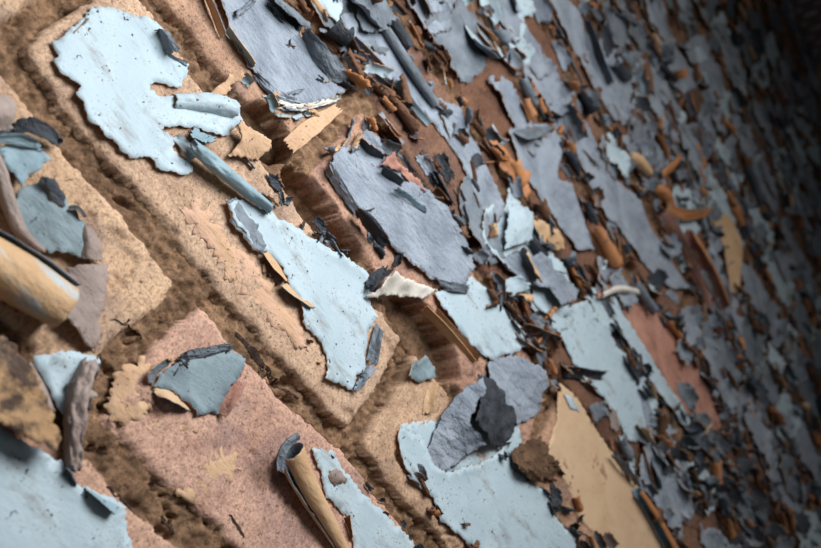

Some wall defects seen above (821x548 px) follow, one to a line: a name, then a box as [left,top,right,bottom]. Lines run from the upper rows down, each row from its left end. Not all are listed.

peeling [391,0,408,17]
peeling [263,173,294,207]
peeling [407,0,821,402]
peeling [0,94,246,548]
peeling [408,355,439,415]
peeling [675,303,821,514]
peeling [276,432,425,548]
peeling [766,447,821,548]